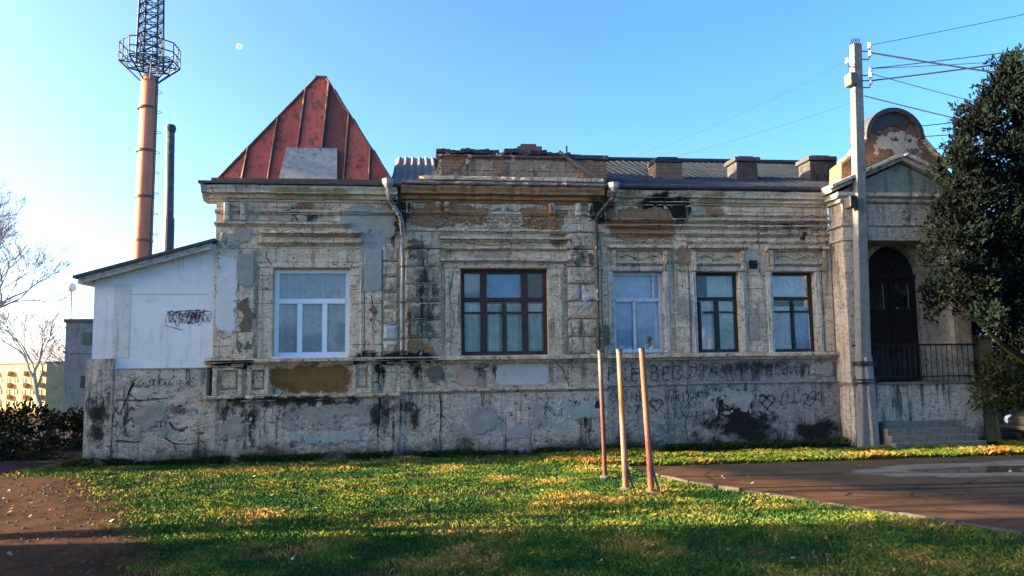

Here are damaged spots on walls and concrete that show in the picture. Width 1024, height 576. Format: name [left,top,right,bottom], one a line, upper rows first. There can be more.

peeling [874,131,925,158]
flaking render [604,205,688,273]
spalling [233,280,258,355]
leakage [89,402,110,445]
leakage [220,395,419,447]
leakage [717,398,753,419]